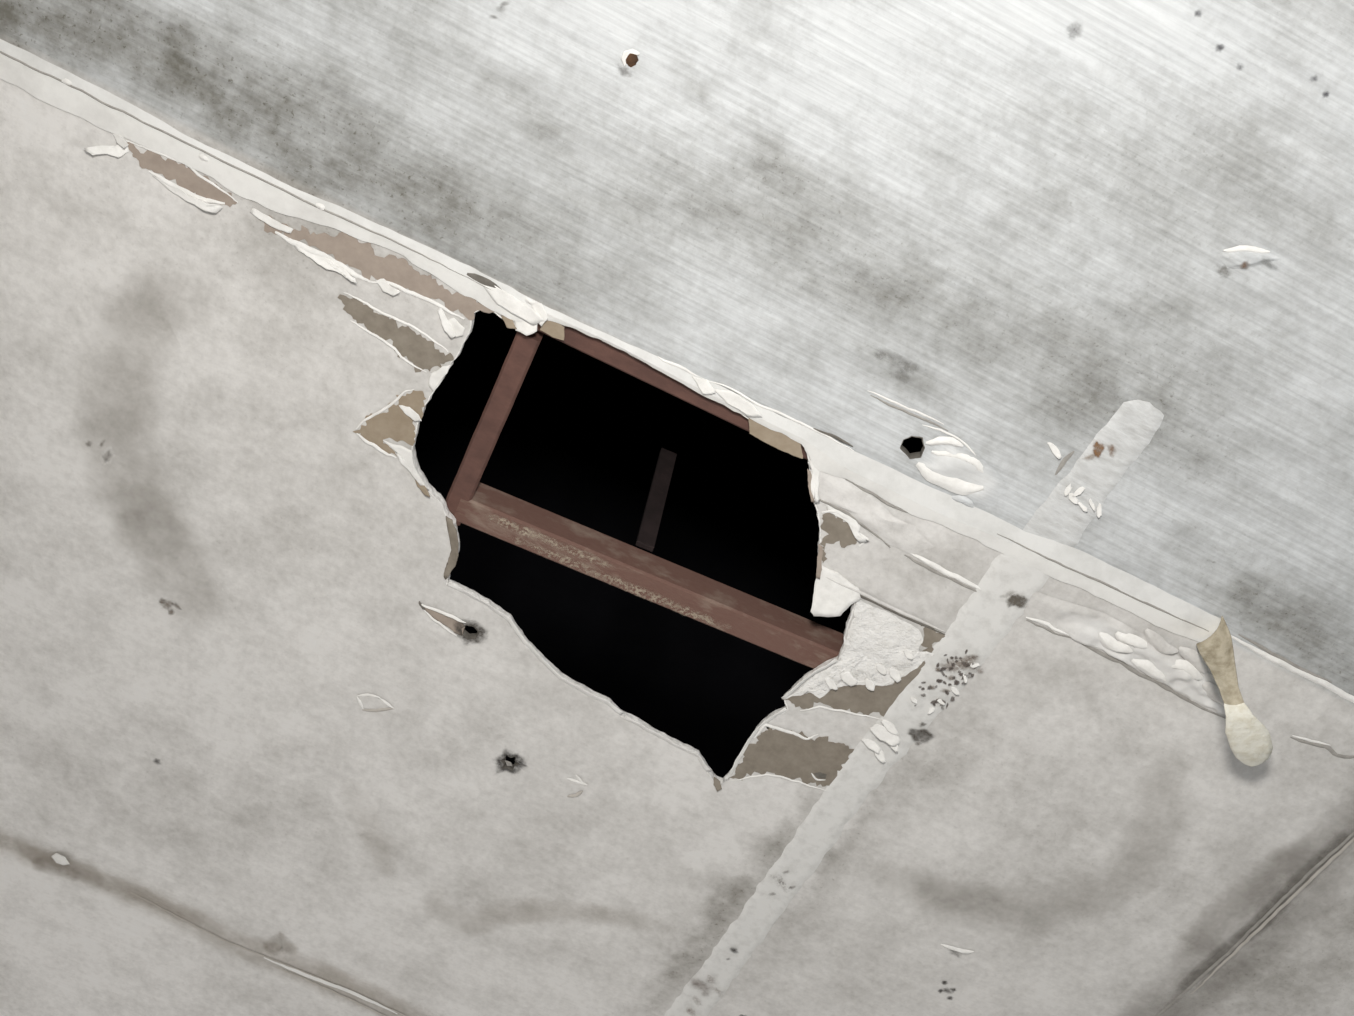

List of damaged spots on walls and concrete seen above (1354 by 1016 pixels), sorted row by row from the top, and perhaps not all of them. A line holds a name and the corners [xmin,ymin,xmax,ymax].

peeling [84,133,548,373]
peeling [353,389,426,458]
peeling [692,376,762,417]
peeling [820,504,869,562]
spalling [424,607,465,636]
flaking render [729,600,980,791]